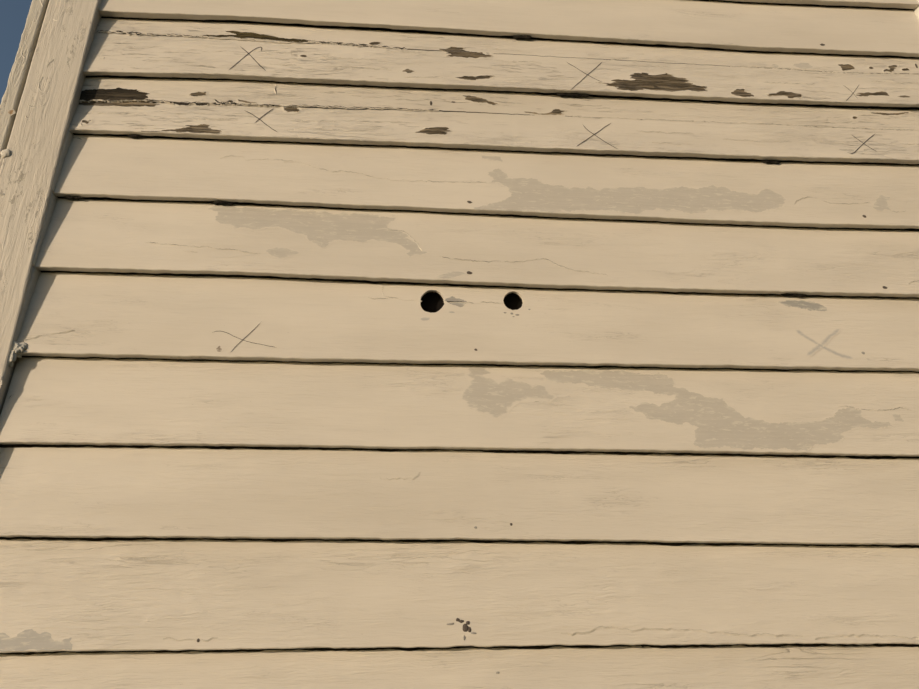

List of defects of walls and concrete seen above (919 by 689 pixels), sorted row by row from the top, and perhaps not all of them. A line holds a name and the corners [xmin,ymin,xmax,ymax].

peeling [439,46,494,60]
peeling [78,90,439,114]
peeling [591,71,708,94]
peeling [729,87,804,100]
peeling [137,123,230,135]
peeling [412,126,452,137]
peeling [573,111,919,131]
crack [220,155,486,183]
peeling [468,154,787,216]
peeling [207,204,430,261]
peeling [459,366,895,452]
peeling [0,627,76,652]